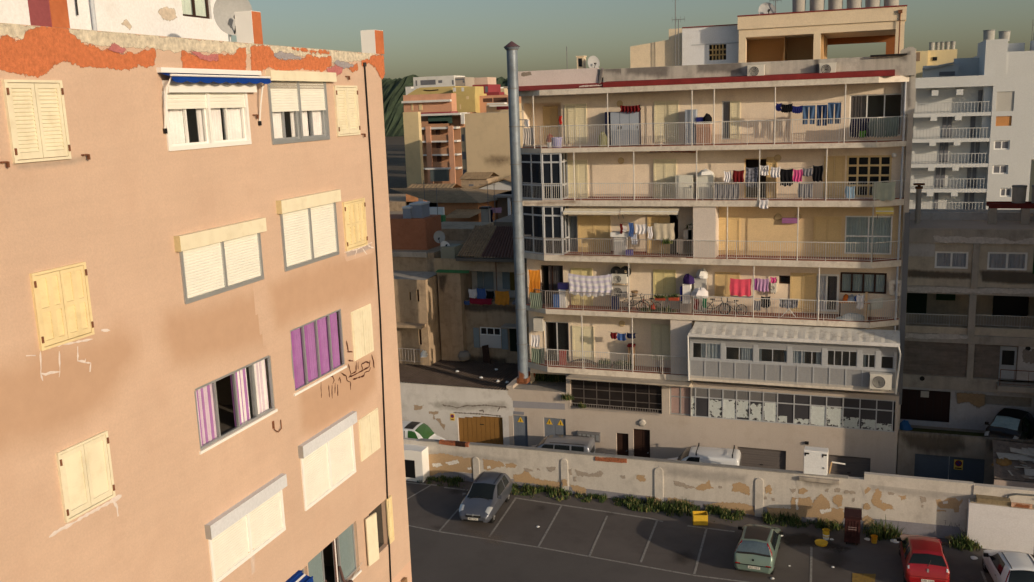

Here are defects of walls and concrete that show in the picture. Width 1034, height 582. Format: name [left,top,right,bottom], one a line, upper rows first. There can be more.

spalling [158,7,177,21]
peeling [0,19,385,79]
crack [26,329,110,381]
crack [321,341,374,398]
spalling [414,405,646,495]
spalling [645,480,906,527]
spalling [920,496,963,512]